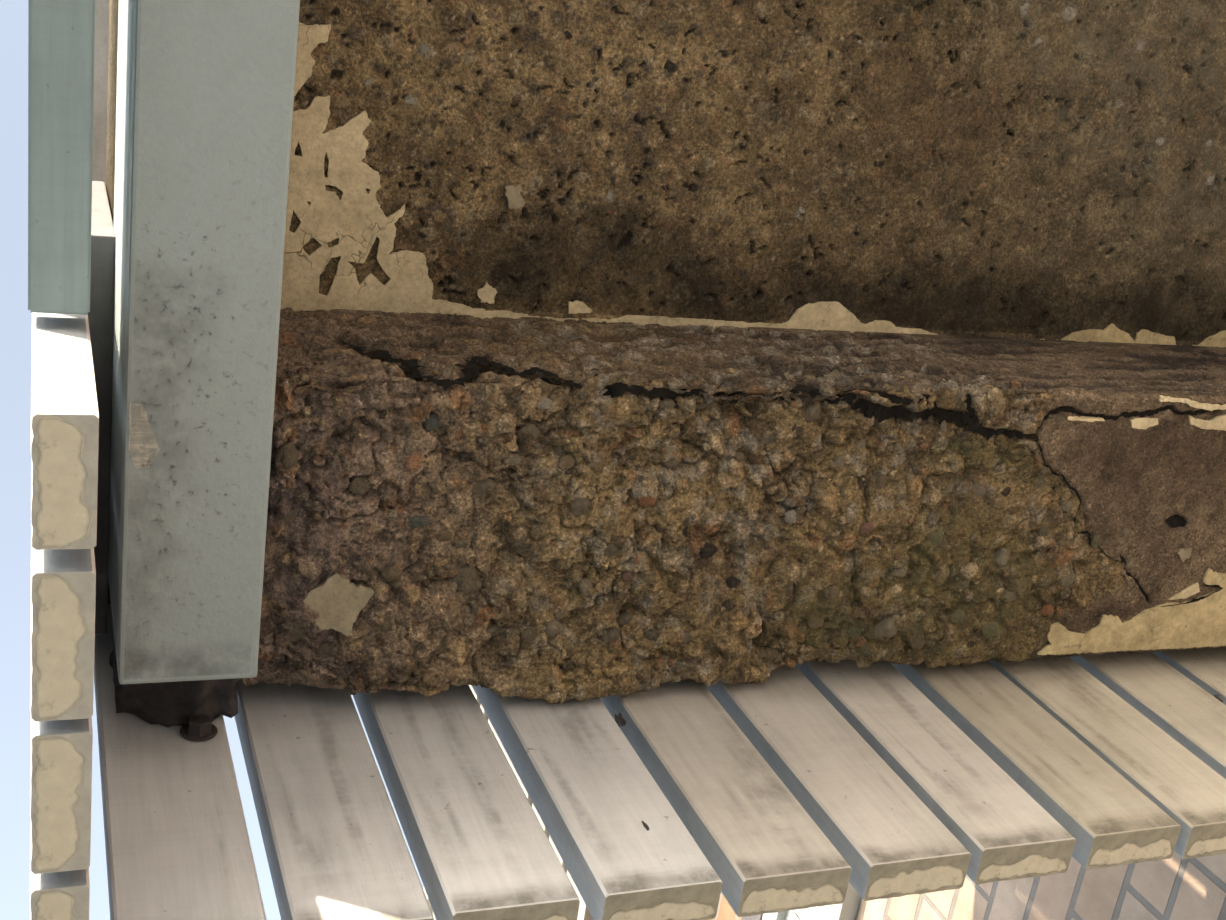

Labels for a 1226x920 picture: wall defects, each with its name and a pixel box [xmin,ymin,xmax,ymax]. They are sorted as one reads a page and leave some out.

spalling [243,22,1226,704]
crack [335,336,1219,544]
crack [1120,554,1223,607]